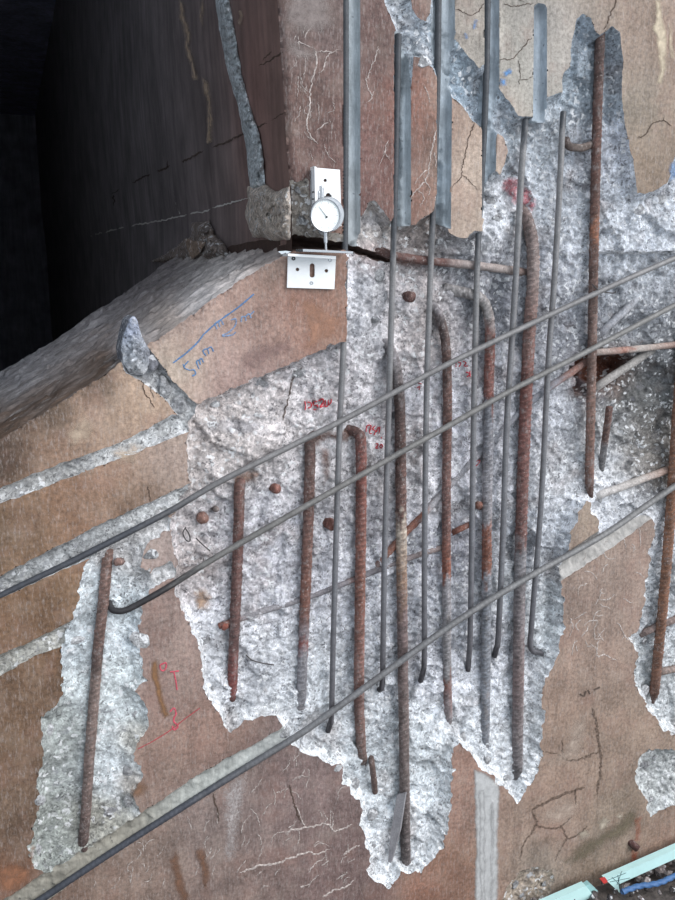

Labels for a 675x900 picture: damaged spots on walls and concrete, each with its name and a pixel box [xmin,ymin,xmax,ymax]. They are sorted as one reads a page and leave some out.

spalling [384,0,437,87]
spalling [245,178,343,242]
crack [227,234,390,262]
crack [410,130,437,204]
crack [453,123,477,190]
spalling [386,14,675,735]
corrosion [316,431,350,477]
spalling [27,252,390,873]
spalling [291,562,566,889]
crack [189,745,360,897]
crack [521,709,602,860]
spalling [635,749,675,817]